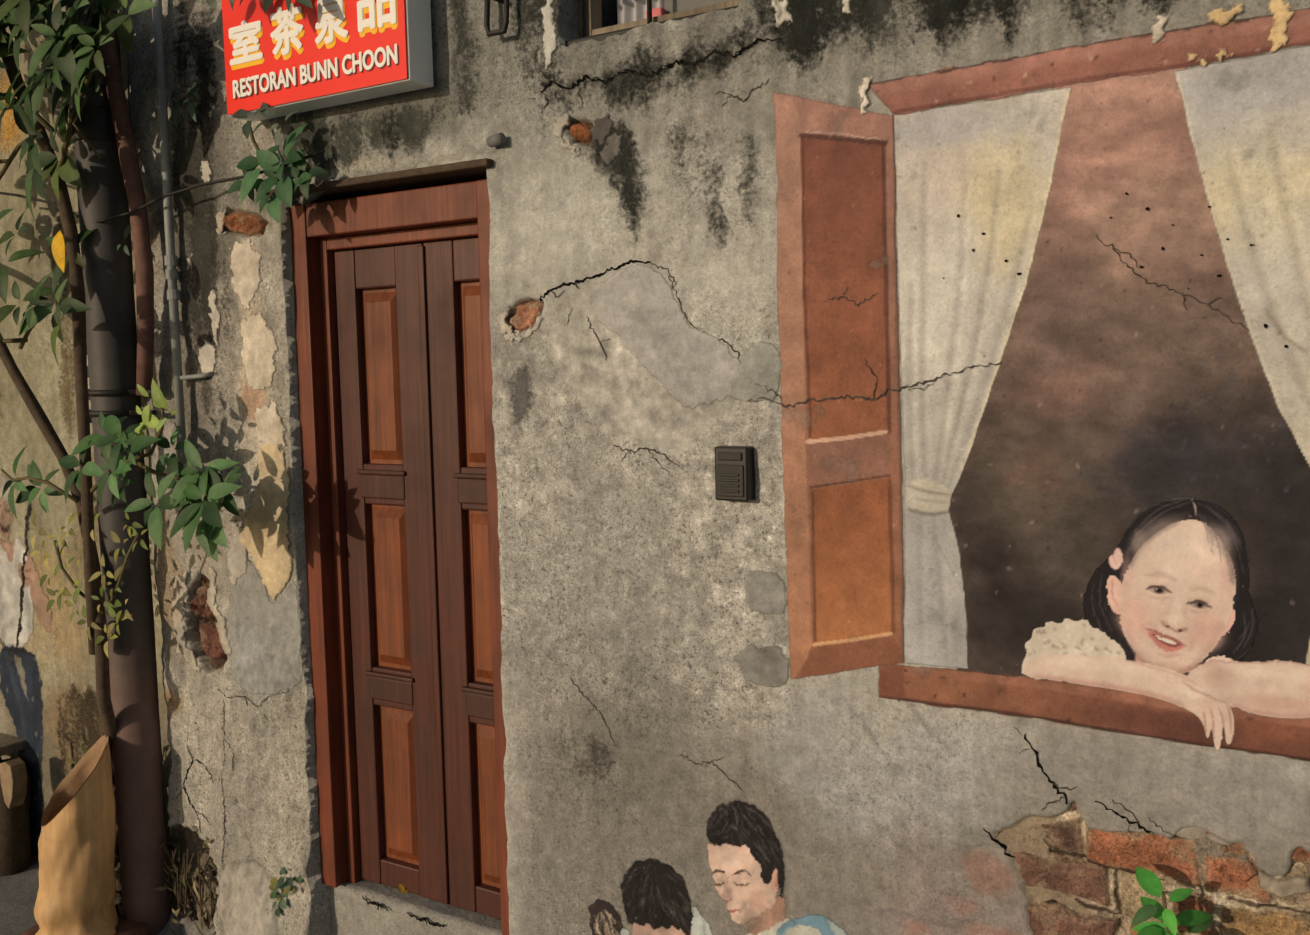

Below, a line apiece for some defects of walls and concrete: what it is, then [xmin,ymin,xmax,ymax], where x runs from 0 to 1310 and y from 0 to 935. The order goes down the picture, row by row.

water stain [171,0,232,356]
flaking render [200,161,211,182]
water stain [449,0,478,114]
water stain [510,0,572,112]
crack [531,38,785,113]
water stain [588,0,1022,246]
flaking render [496,301,544,342]
crack [539,259,1001,408]
flaking render [170,207,292,673]
crack [1013,727,1174,836]
crack [983,829,1015,858]
flaking render [1013,802,1310,935]